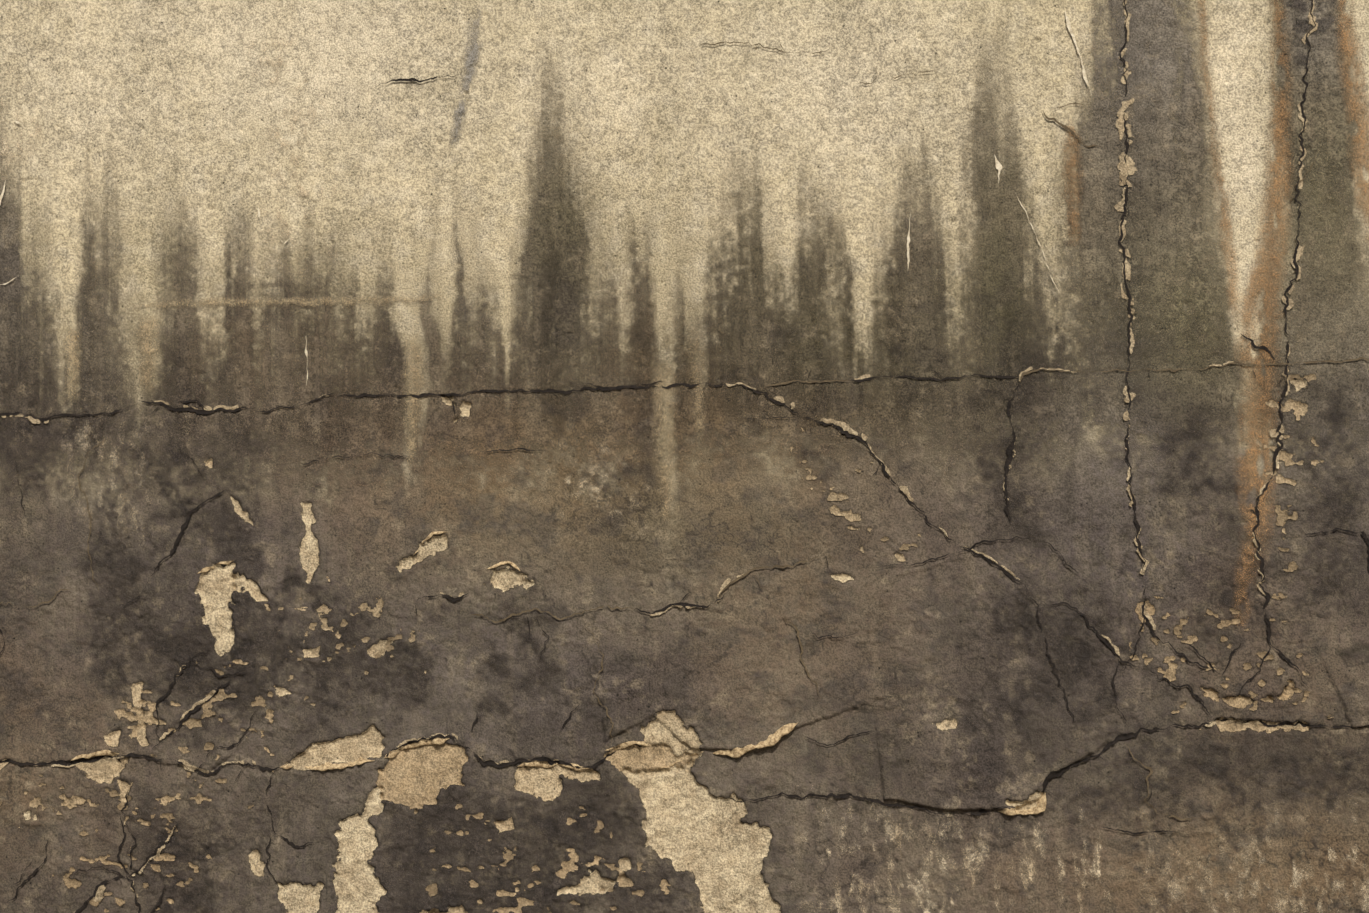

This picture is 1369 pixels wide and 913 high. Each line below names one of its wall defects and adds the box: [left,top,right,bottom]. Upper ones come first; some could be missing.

crack [371,74,459,89]
crack [139,358,1081,540]
damp [0,0,1244,574]
crack [960,0,1369,822]
rust [1231,92,1288,530]
damp [1260,0,1369,451]
damp [87,504,300,707]
peeling [18,502,468,913]
peeling [487,561,535,592]
peeling [419,710,781,913]
crack [375,554,857,768]
peeling [1199,651,1310,734]